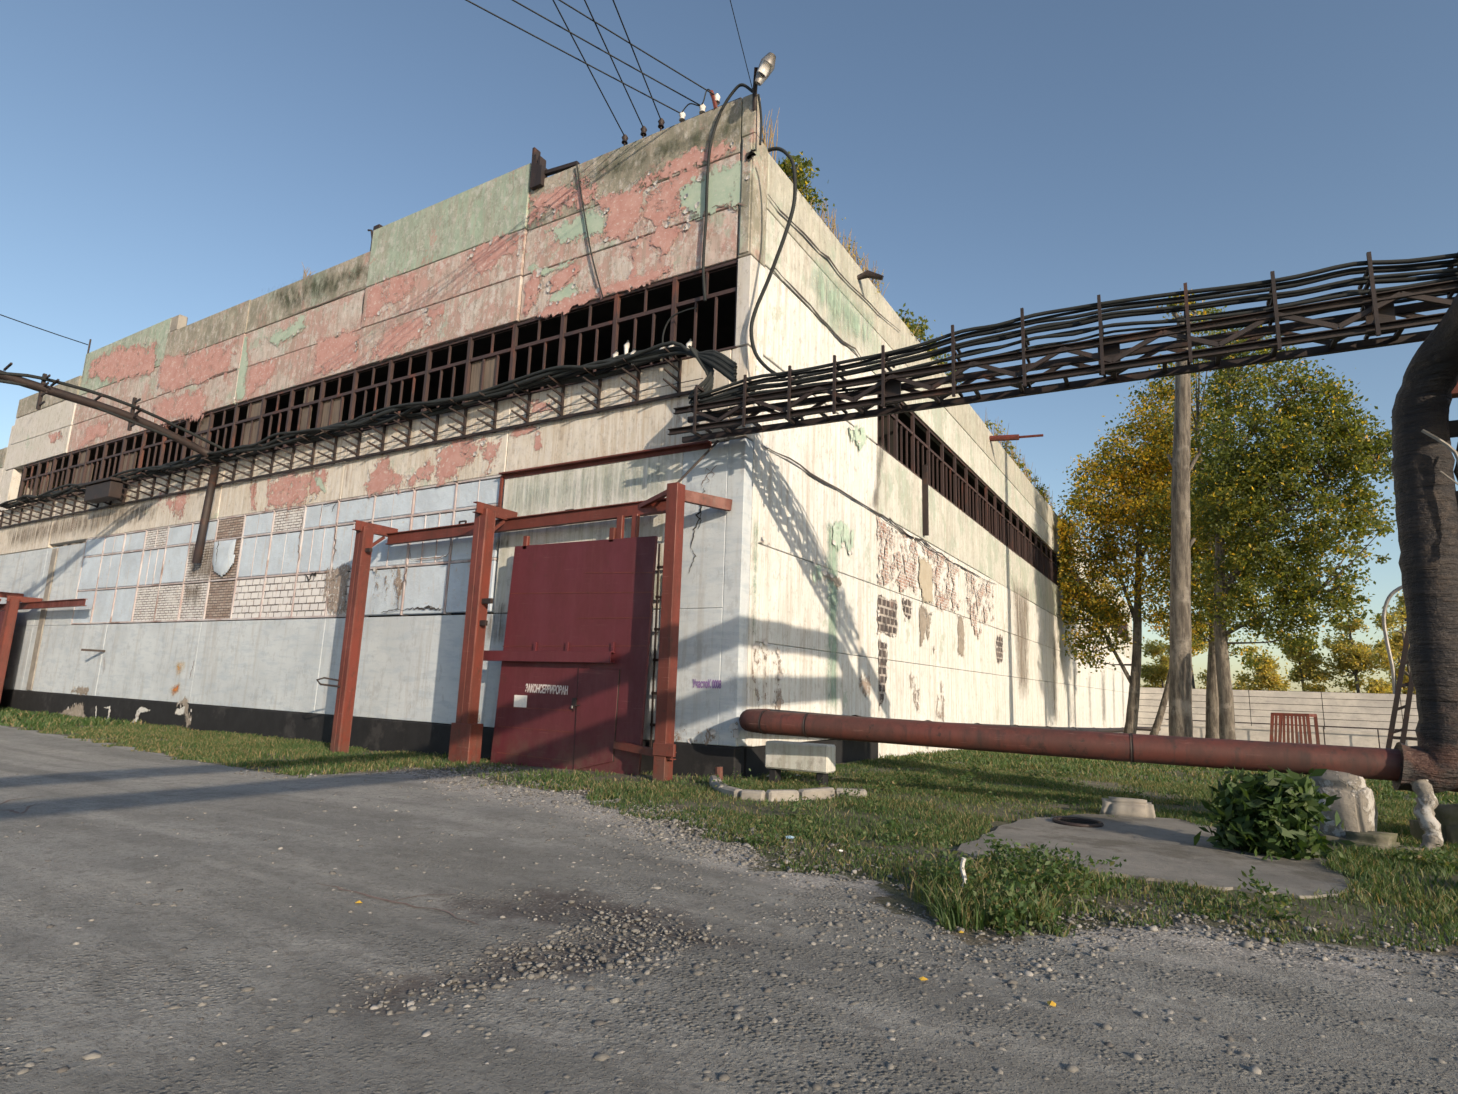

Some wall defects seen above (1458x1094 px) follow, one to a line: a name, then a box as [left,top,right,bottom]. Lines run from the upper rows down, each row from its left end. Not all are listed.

peeling [467,138,754,319]
peeling [86,268,445,427]
peeling [249,468,328,512]
spalling [813,560,842,587]
water stain [828,528,838,702]
peeling [830,519,854,557]
flaking render [859,517,1004,711]
peeling [909,673,945,721]